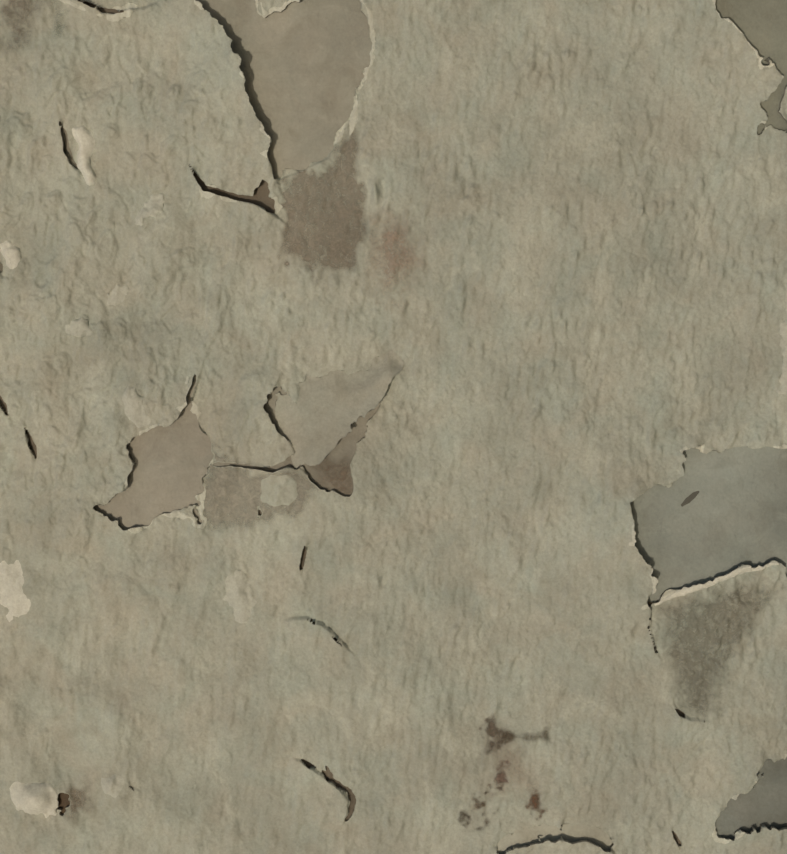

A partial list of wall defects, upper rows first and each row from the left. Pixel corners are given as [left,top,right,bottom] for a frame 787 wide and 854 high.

peeling [158,0,389,192]
peeling [675,0,787,135]
peeling [55,121,97,186]
crack [176,164,284,237]
peeling [87,350,404,547]
peeling [593,433,787,629]
crack [287,618,351,653]
spalling [57,793,70,816]
crack [295,759,356,824]
peeling [497,823,614,854]
spalling [663,831,682,853]
peeling [702,717,787,854]